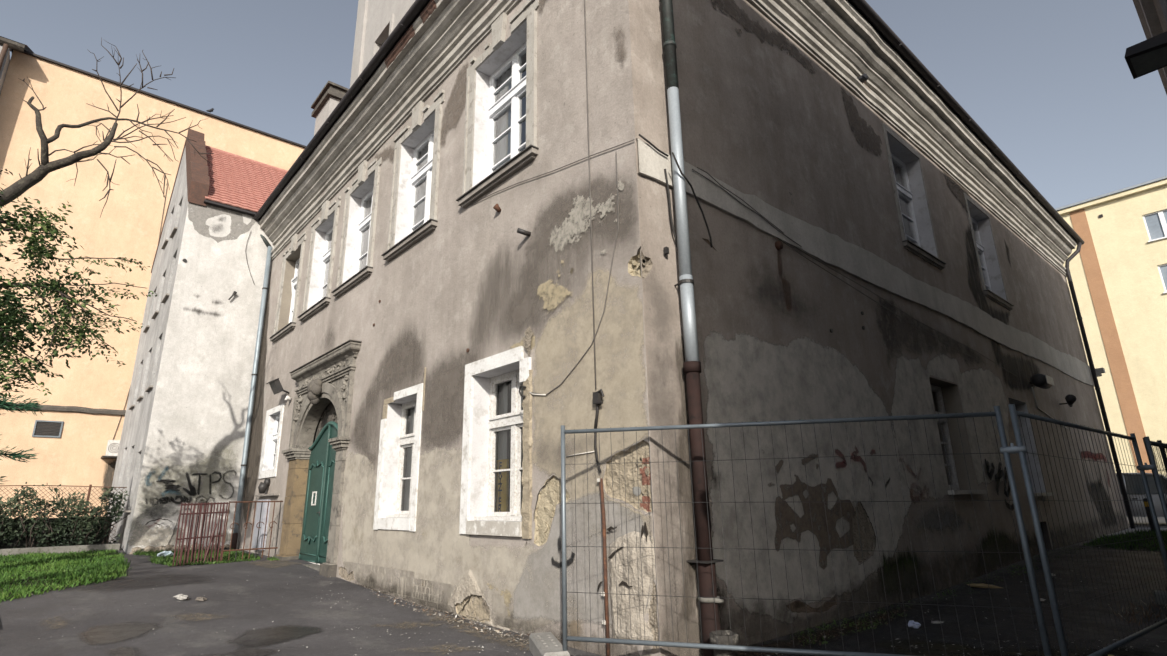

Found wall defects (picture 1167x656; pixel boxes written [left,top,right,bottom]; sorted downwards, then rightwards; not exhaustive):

leakage [711,0,815,73]
flaking render [188,201,257,243]
leakage [478,181,631,340]
peeling [537,180,629,313]
flaking render [628,246,653,279]
leakage [355,334,474,466]
flaking render [534,476,570,546]
flaking render [603,440,652,513]
flaking render [768,454,876,569]
flaking render [455,584,512,623]